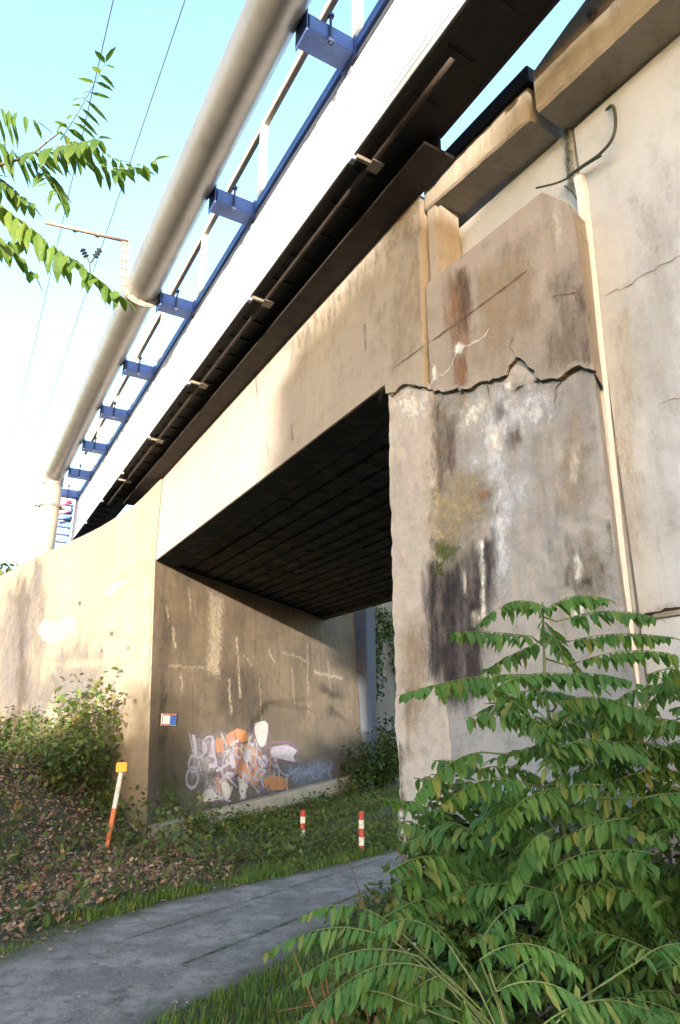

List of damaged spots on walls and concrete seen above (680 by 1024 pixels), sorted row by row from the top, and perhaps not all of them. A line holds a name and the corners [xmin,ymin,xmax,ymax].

corrosion [447,271,470,346]
crack [606,255,680,296]
crack [390,337,596,428]
water stain [424,541,494,706]